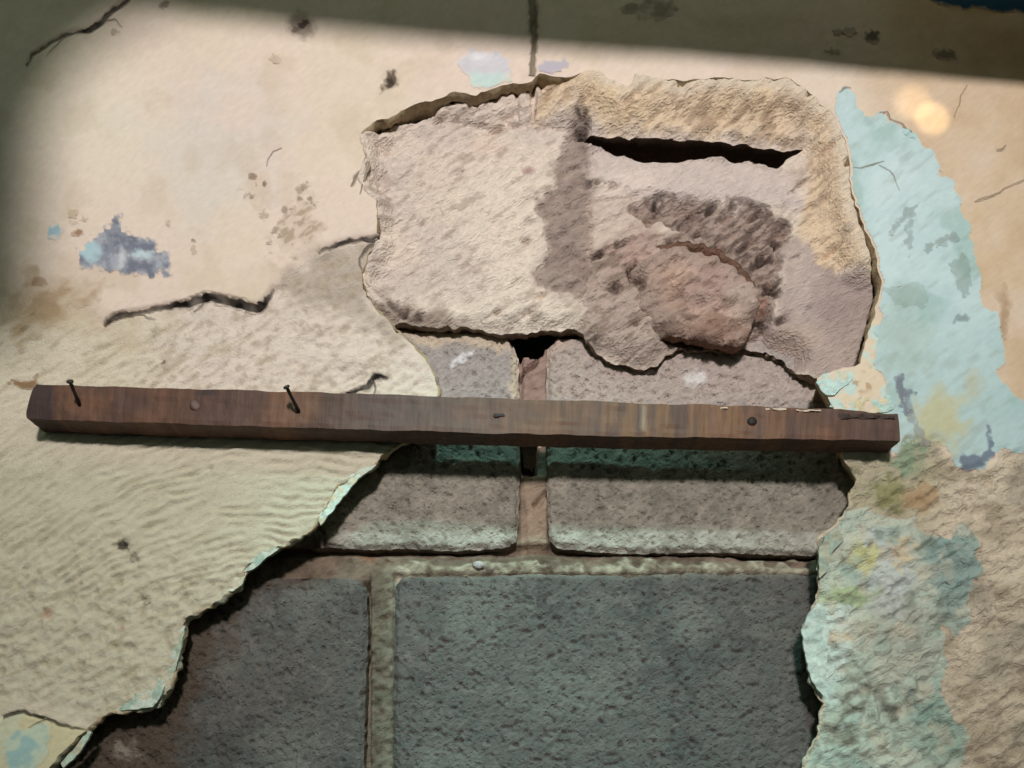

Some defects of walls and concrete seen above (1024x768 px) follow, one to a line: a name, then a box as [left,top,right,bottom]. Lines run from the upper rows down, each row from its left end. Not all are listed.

crack [25,0,130,67]
peeling [75,213,174,278]
flaking render [357,46,1024,472]
crack [103,288,275,327]
flaking render [0,443,987,768]